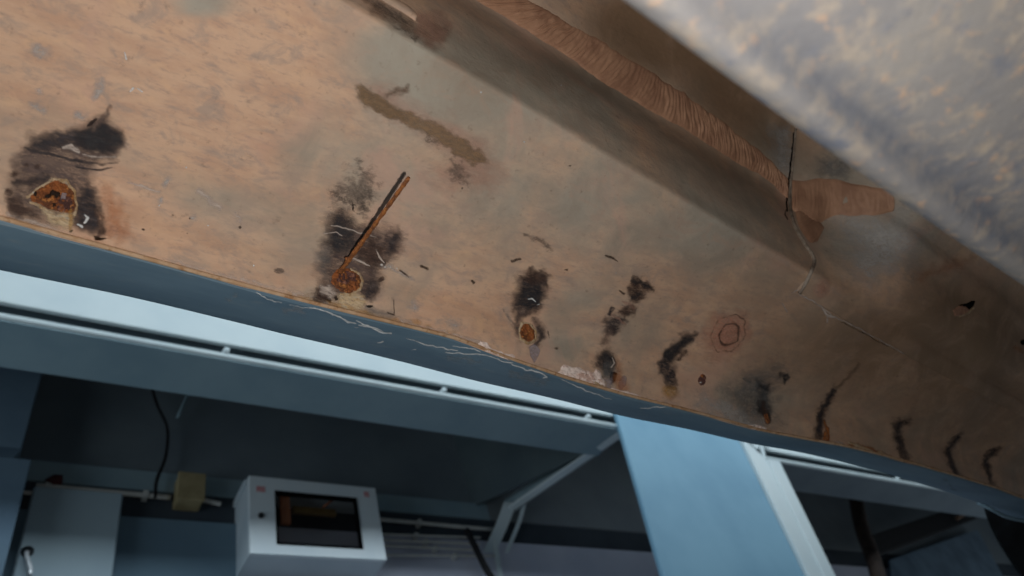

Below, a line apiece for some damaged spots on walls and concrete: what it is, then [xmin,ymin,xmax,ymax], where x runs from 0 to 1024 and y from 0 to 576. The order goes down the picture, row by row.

damp [357,86,486,177]
corrosion [26,177,78,216]
crack [784,132,794,220]
corrosion [331,268,365,310]